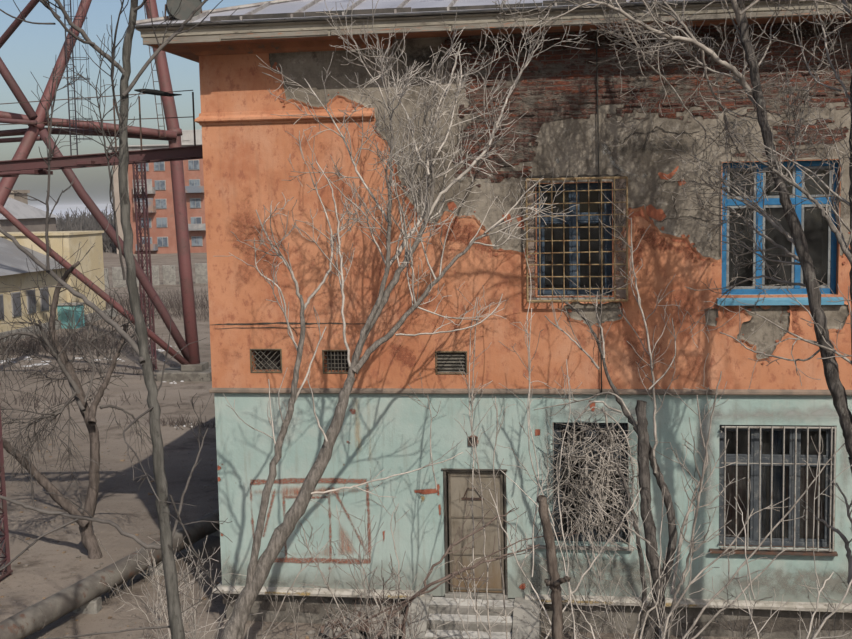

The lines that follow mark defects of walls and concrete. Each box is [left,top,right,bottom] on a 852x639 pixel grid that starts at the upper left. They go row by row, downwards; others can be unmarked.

spalling [266,20,852,329]
spalling [696,305,800,364]
spalling [821,302,851,334]